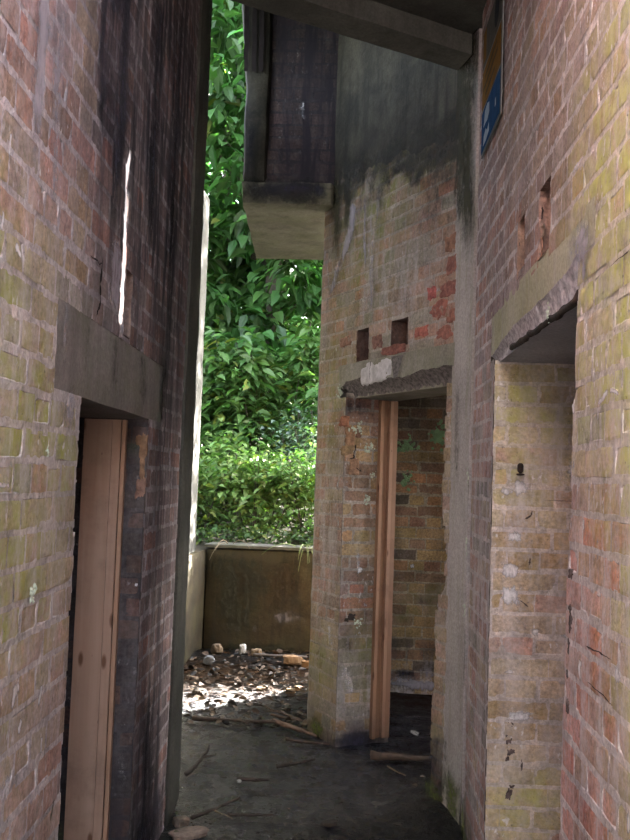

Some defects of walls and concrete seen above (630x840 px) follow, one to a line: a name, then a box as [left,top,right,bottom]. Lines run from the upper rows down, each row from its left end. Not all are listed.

leakage [455,29,478,235]
leakage [331,180,374,291]
spalling [414,232,457,340]
spalling [339,334,452,398]